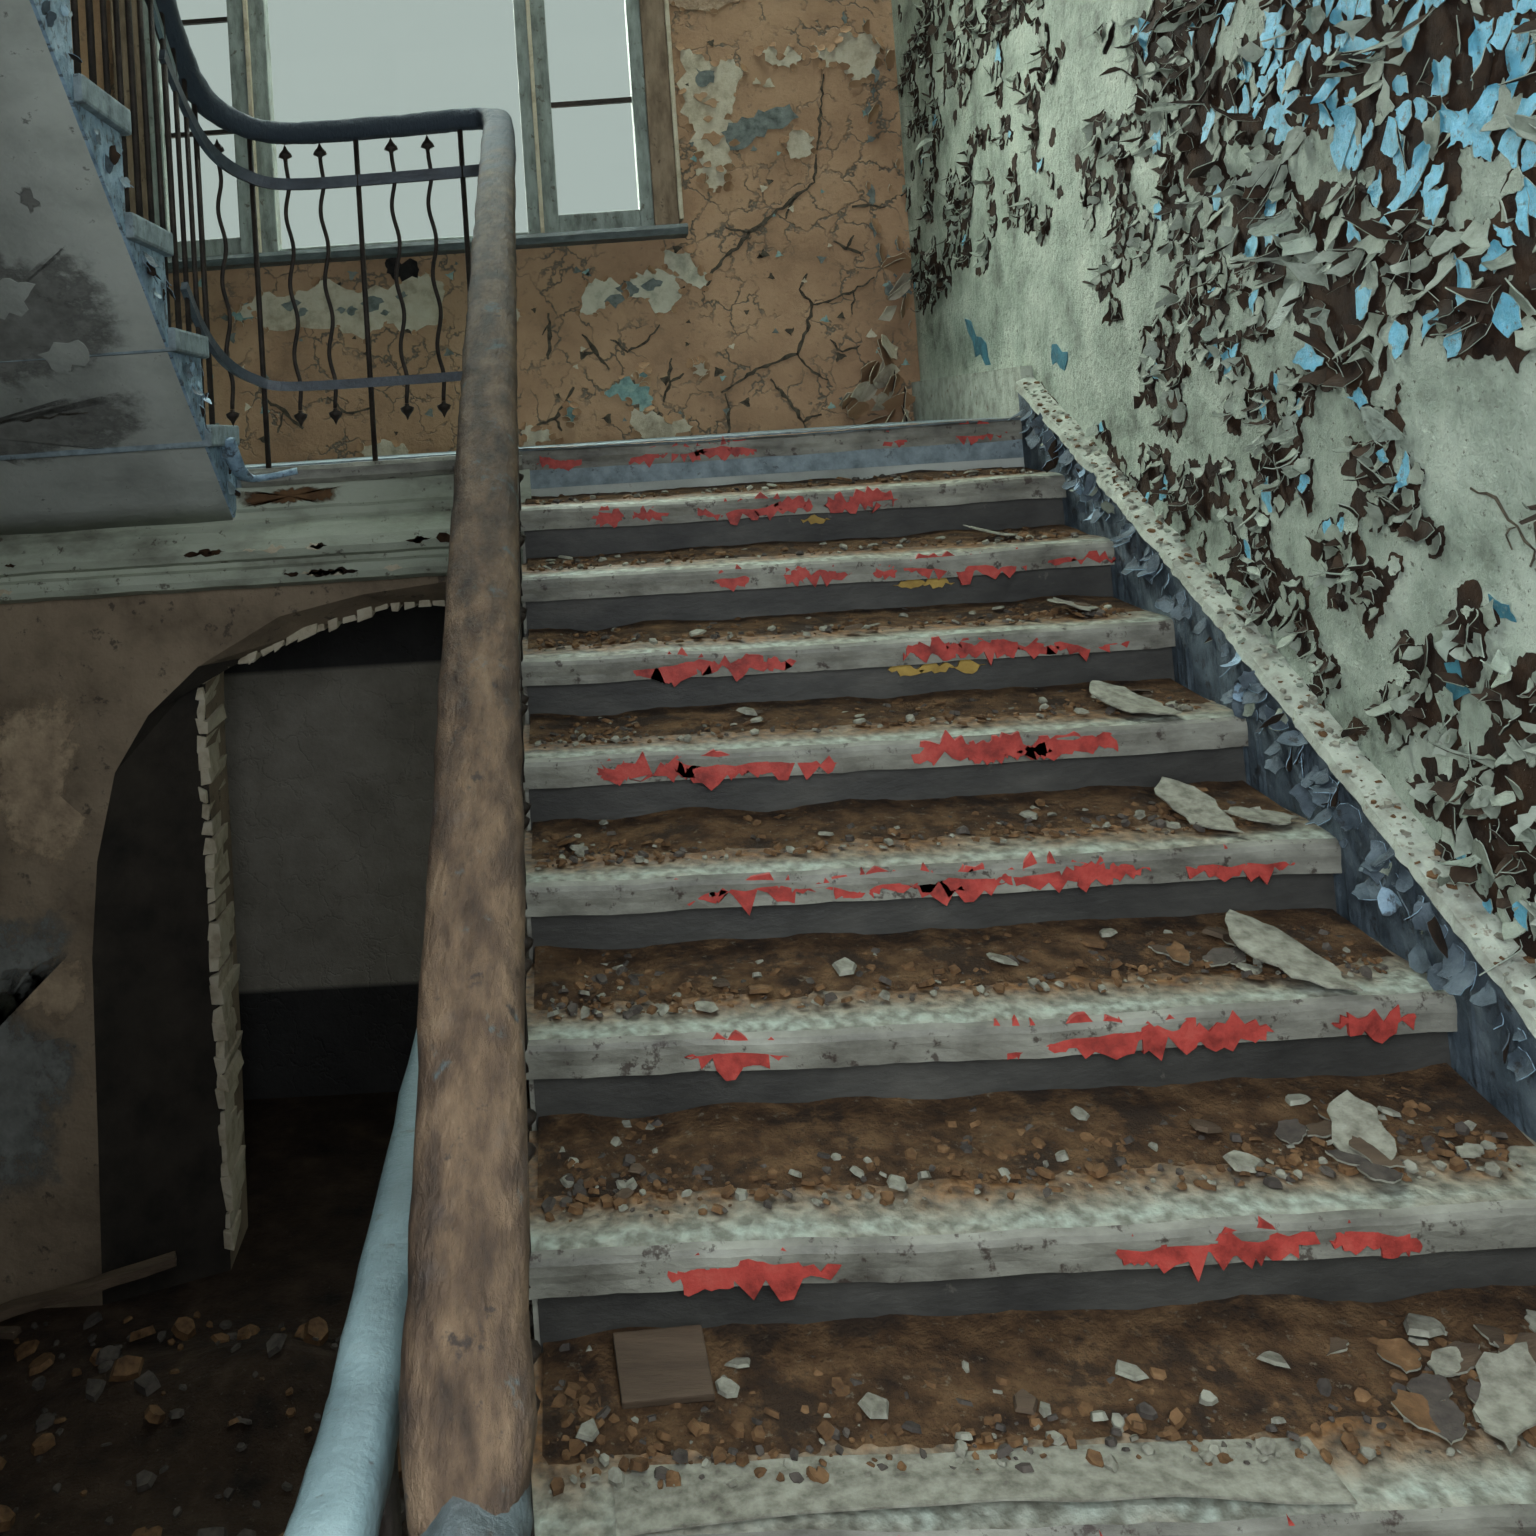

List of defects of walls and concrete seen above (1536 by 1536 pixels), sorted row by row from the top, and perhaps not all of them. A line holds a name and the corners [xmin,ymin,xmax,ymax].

peeling [93,128,134,208]
crack [704,74,824,292]
peeling [221,262,458,355]
peeling [573,244,713,323]
crack [721,204,885,433]
crack [536,313,684,431]
peeling [592,505,669,528]
peeling [669,0,1536,1081]
peeling [633,647,796,687]
peeling [596,749,836,791]
peeling [667,1247,842,1301]
peeling [1115,1216,1423,1282]